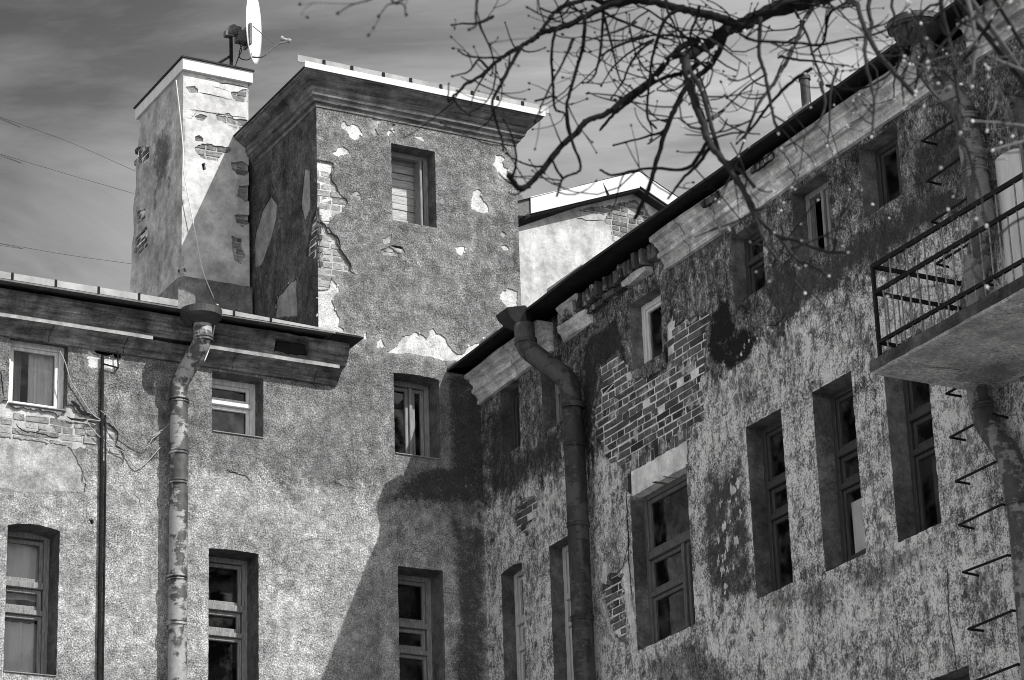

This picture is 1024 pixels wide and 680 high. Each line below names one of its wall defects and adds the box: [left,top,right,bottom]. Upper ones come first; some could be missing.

flaking render [195,137,248,202]
flaking render [231,196,277,267]
crack [319,219,356,275]
flaking render [302,118,395,332]
flaking render [471,188,488,213]
flaking render [492,155,510,181]
flaking render [500,289,517,307]
flaking render [362,328,486,361]
leakage [708,300,756,369]
flaking render [0,401,124,493]
flaking render [593,313,716,545]
flaking render [602,560,641,649]